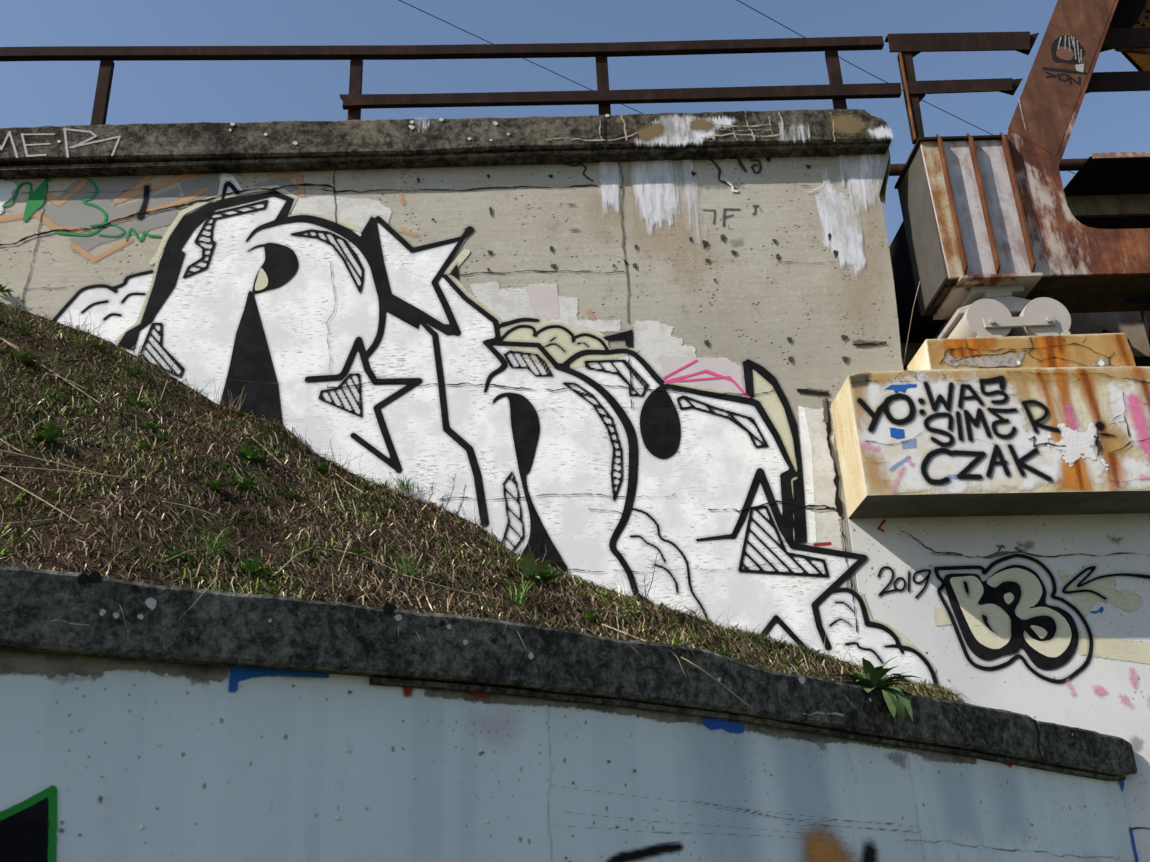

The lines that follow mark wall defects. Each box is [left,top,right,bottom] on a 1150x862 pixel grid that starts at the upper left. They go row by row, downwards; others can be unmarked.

efflorescence [545,111,785,146]
efflorescence [829,112,893,141]
crack [0,183,336,246]
efflorescence [600,160,706,242]
efflorescence [809,154,882,274]
corrosion [921,141,964,277]
crack [851,334,1150,453]
corrosion [854,333,1150,491]
crack [437,493,675,516]
crack [708,398,858,632]
crack [901,531,1066,558]